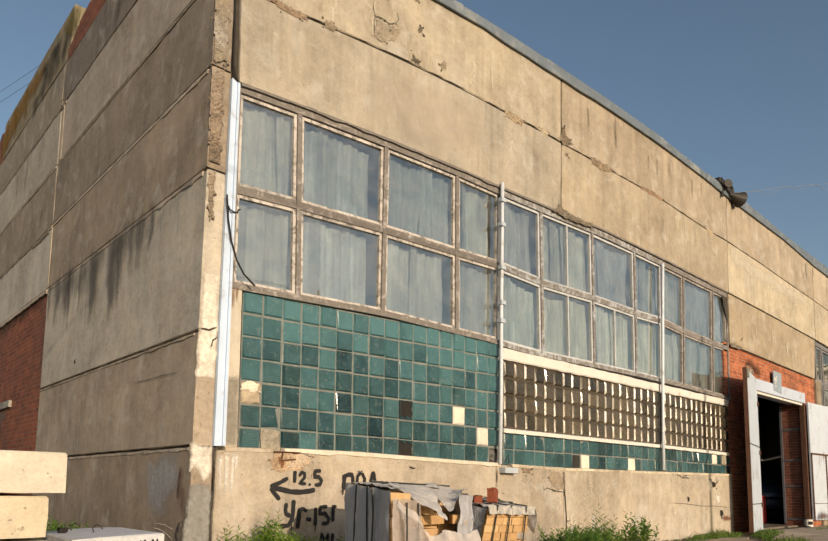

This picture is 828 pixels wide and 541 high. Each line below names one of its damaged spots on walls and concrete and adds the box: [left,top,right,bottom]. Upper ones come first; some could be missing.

spalling [268,0,309,21]
spalling [207,0,232,219]
spalling [502,109,573,159]
spalling [587,155,616,172]
peeling [196,275,218,377]
spalling [240,380,262,393]
peeling [190,444,212,480]
spalling [268,451,315,473]